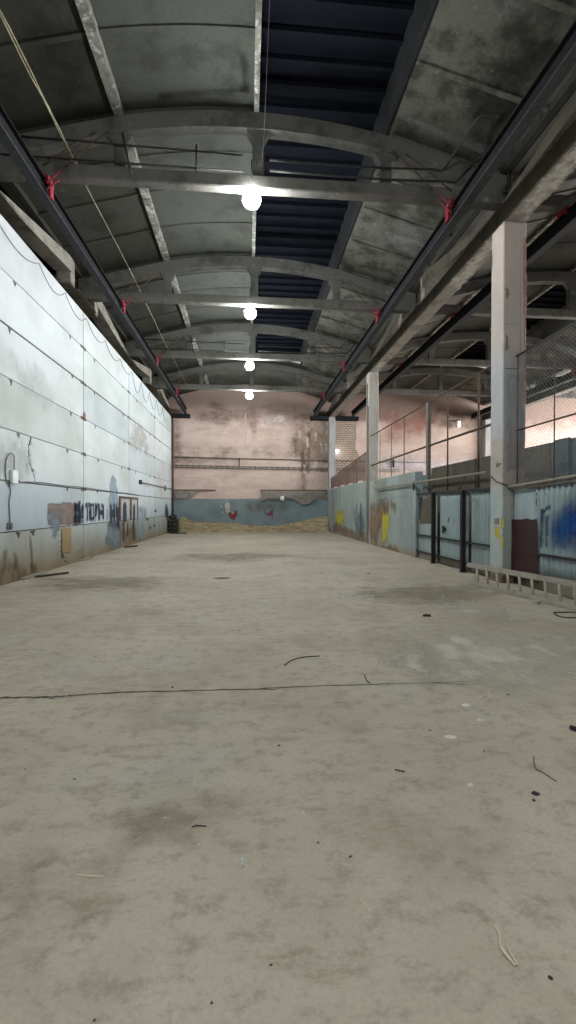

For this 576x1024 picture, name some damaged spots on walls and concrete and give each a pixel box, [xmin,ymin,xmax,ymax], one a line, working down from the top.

crack [25,436,37,480]
rust [62,528,71,553]
rust [333,499,398,552]
crack [0,683,401,699]